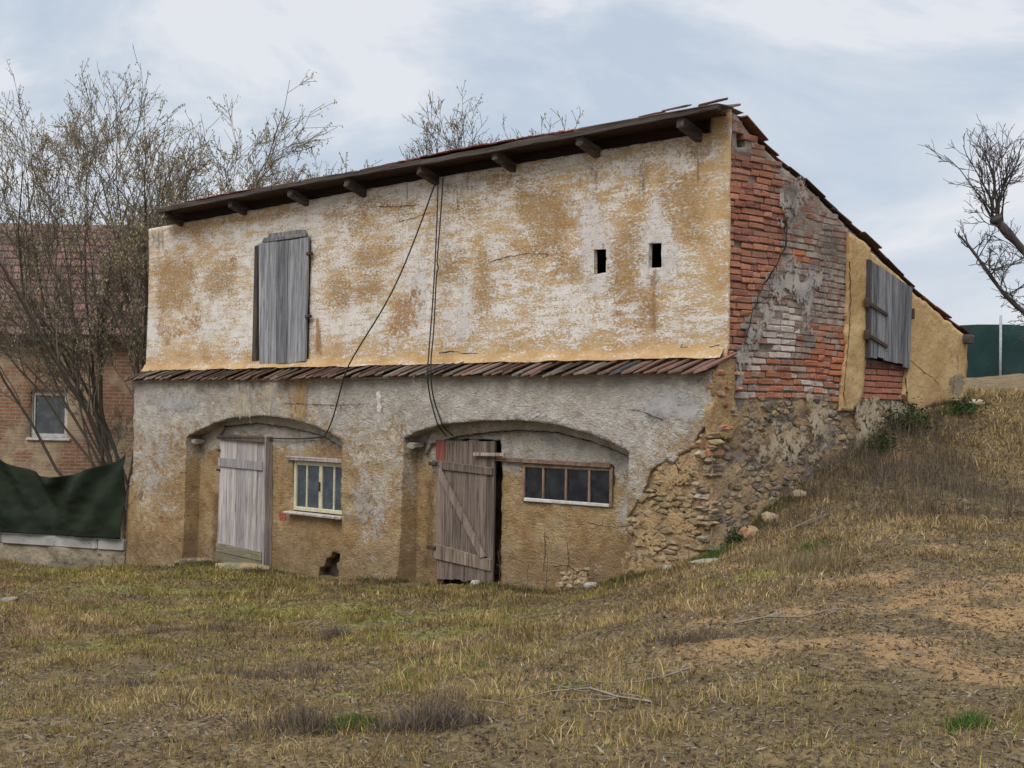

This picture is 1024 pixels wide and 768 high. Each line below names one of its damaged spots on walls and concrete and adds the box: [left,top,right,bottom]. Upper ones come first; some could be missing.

peeling [153,208,299,345]
peeling [324,197,496,353]
peeling [449,169,710,333]
crack [709,212,789,348]
flaking render [728,119,848,402]
peeling [632,387,704,422]
spalling [325,557,340,578]
spalling [621,429,725,574]